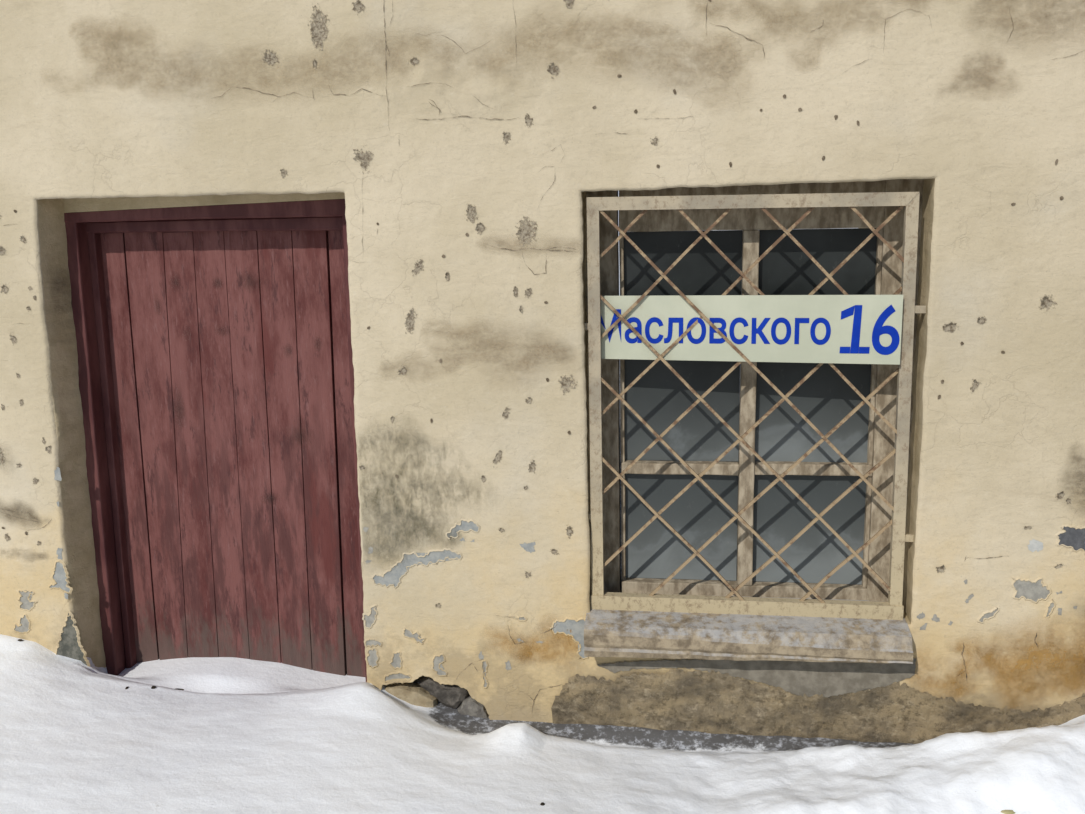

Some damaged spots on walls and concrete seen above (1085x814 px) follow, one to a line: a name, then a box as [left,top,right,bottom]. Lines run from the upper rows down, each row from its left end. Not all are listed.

peeling [365,518,481,590]
peeling [1055,524,1085,555]
peeling [549,617,589,660]
peeling [917,612,953,630]
peeling [977,606,1000,624]
peeling [1011,576,1077,618]
spalling [362,604,497,720]
rust [1005,642,1085,679]
flaking render [551,668,1085,744]